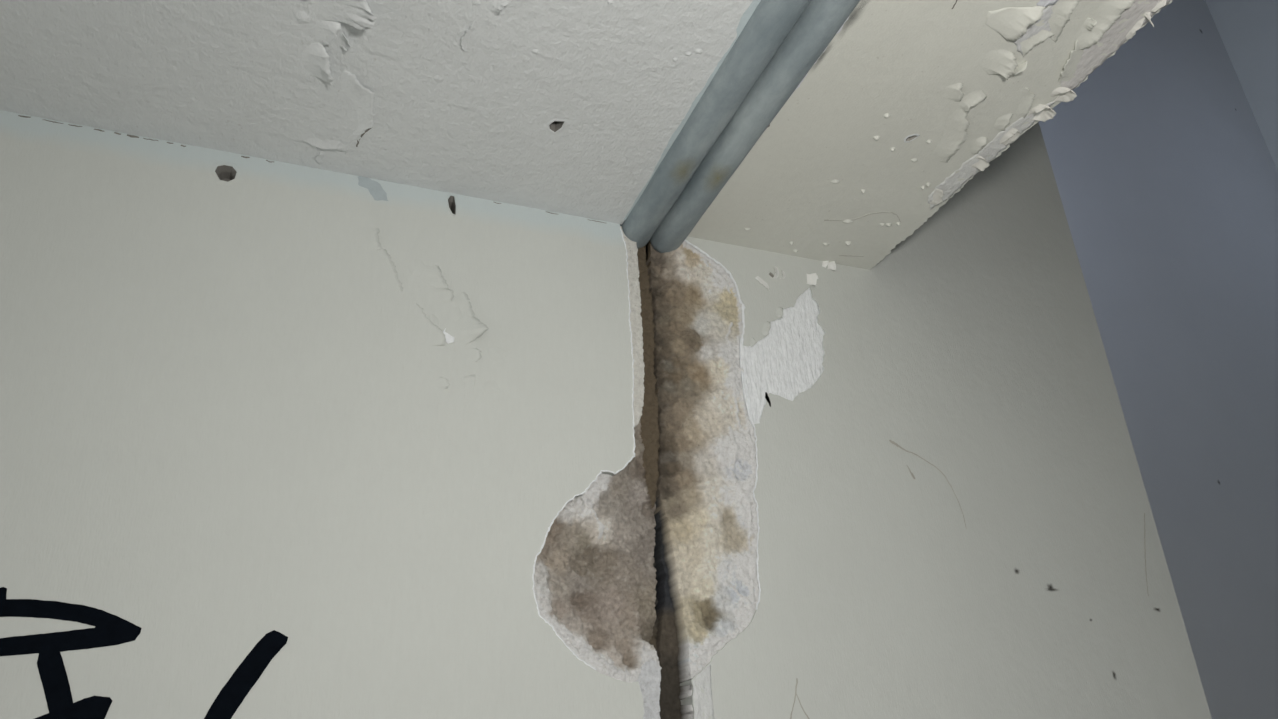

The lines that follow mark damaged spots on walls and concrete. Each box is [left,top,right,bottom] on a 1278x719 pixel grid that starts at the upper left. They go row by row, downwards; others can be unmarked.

peeling [302,0,376,144]
peeling [927,0,1170,210]
spalling [532,226,836,719]